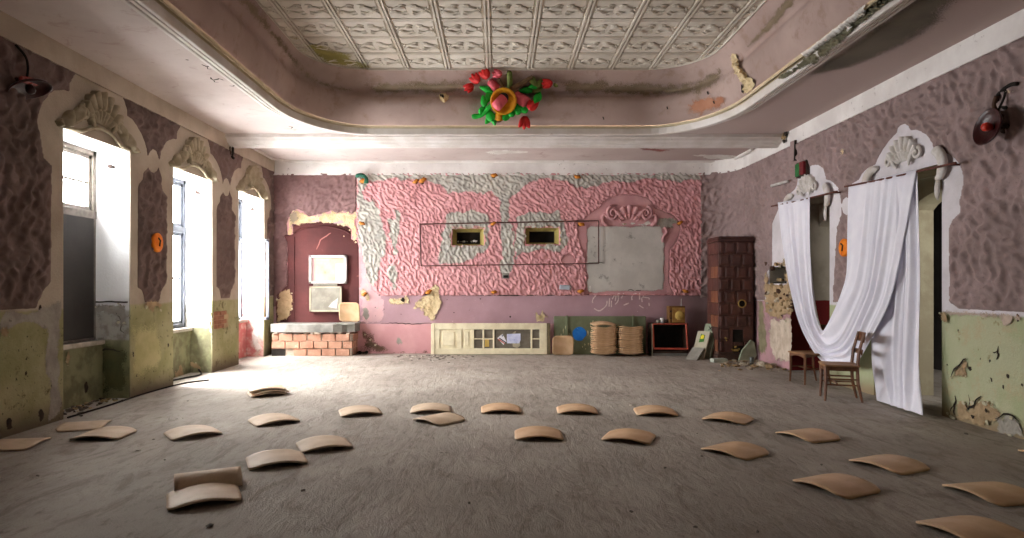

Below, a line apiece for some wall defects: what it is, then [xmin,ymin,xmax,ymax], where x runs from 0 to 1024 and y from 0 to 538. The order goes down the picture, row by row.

leakage [559,68,721,98]
peeling [287,172,701,324]
spalling [763,258,794,362]
spalling [946,358,991,379]
spalling [956,395,1024,438]